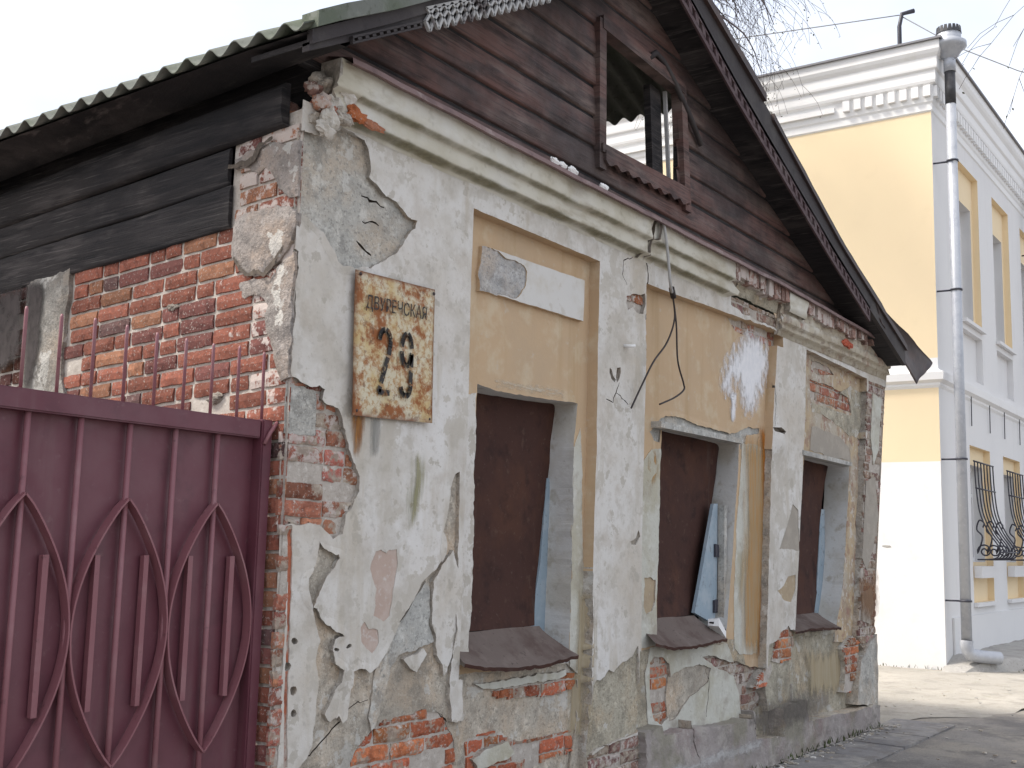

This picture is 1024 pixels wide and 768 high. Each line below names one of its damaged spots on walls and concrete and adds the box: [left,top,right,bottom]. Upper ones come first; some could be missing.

spalling [234,71,417,276]
rust [353,415,364,453]
peeling [239,246,885,768]